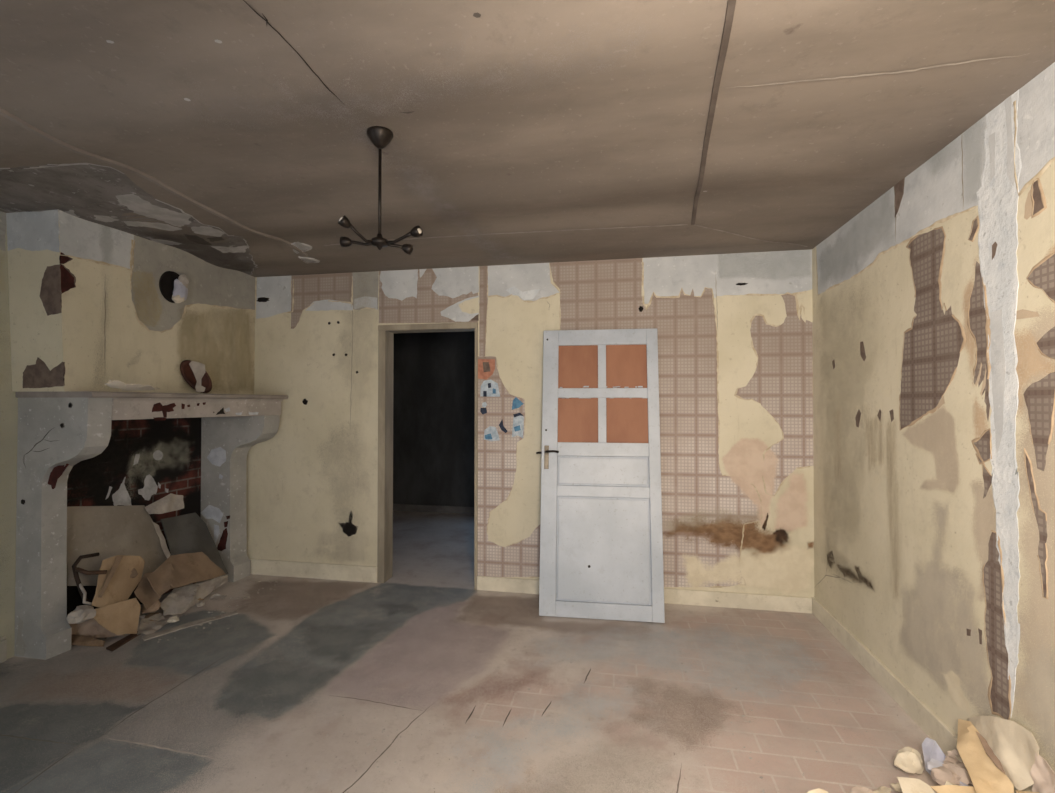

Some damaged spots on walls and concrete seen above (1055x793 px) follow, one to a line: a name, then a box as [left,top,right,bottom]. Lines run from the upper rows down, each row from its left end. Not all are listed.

crack [243,0,339,99]
peeling [0,163,560,333]
spalling [23,358,65,388]
flaking render [639,62,1055,716]
leakage [0,578,661,793]
crack [330,695,434,793]